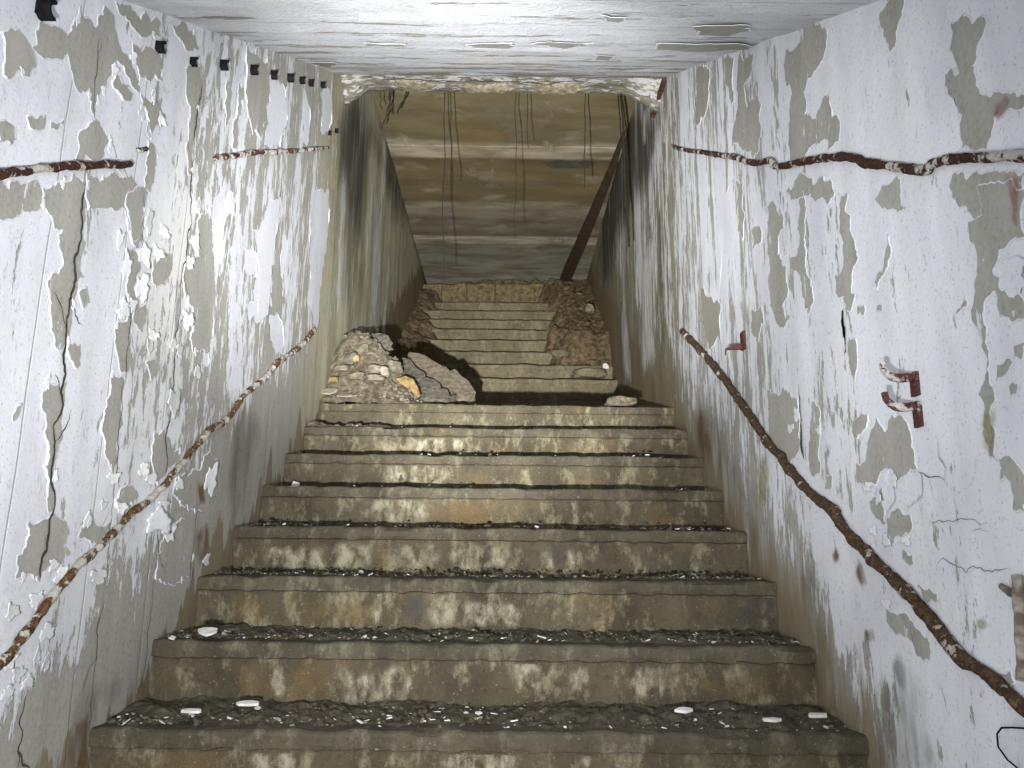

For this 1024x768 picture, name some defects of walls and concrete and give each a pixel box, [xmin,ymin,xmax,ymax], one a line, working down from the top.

peeling [224,44,271,150]
peeling [654,24,762,159]
peeling [879,0,905,53]
peeling [944,13,1024,152]
water stain [340,105,390,334]
water stain [387,161,400,205]
peeling [735,22,883,341]
crack [39,182,86,582]
peeling [0,0,221,622]
peeling [767,387,833,490]
peeling [852,410,918,567]
peeling [949,169,1024,514]